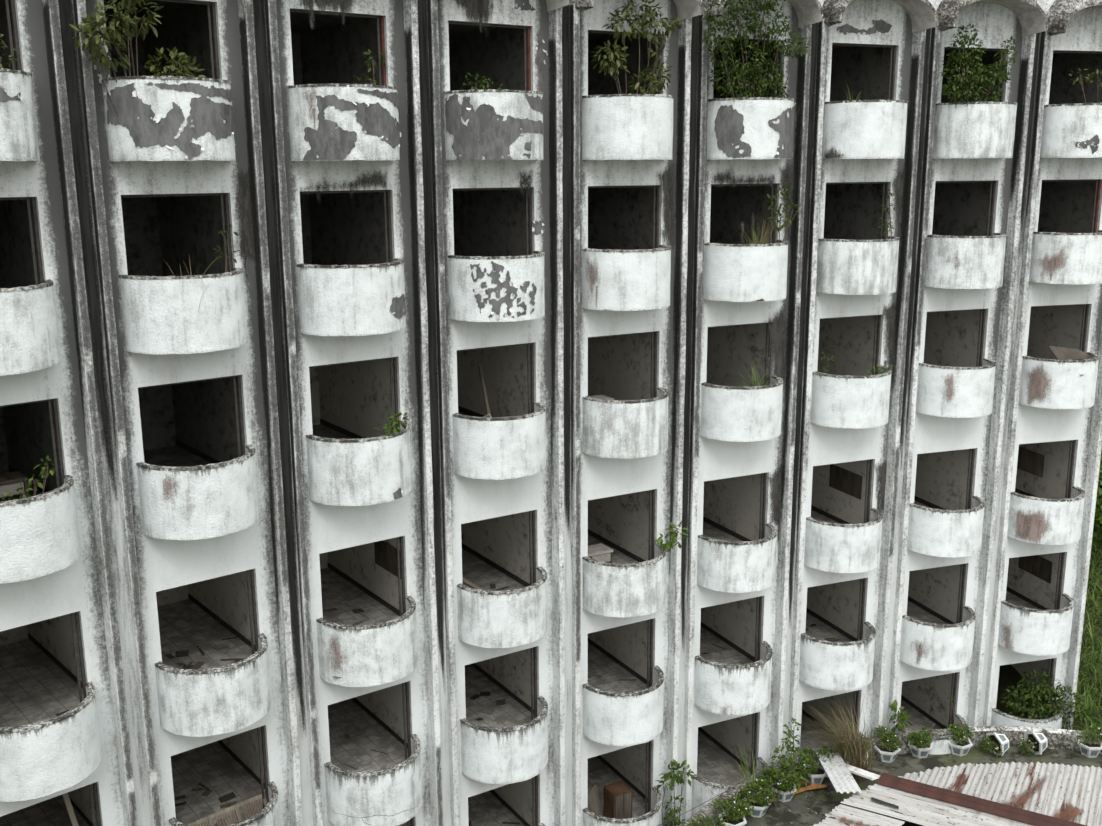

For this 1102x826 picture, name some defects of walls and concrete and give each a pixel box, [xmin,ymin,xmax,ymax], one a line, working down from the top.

peeling [509,0,536,12]
peeling [535,34,548,84]
peeling [93,50,234,160]
peeling [303,88,401,160]
peeling [445,93,544,160]
peeling [714,105,752,159]
peeling [768,103,796,159]
peeling [470,261,537,319]
corrosion [1027,367,1051,404]
corrosion [1016,511,1051,543]
corrosion [1001,777,1047,809]
corrosion [1053,803,1084,821]